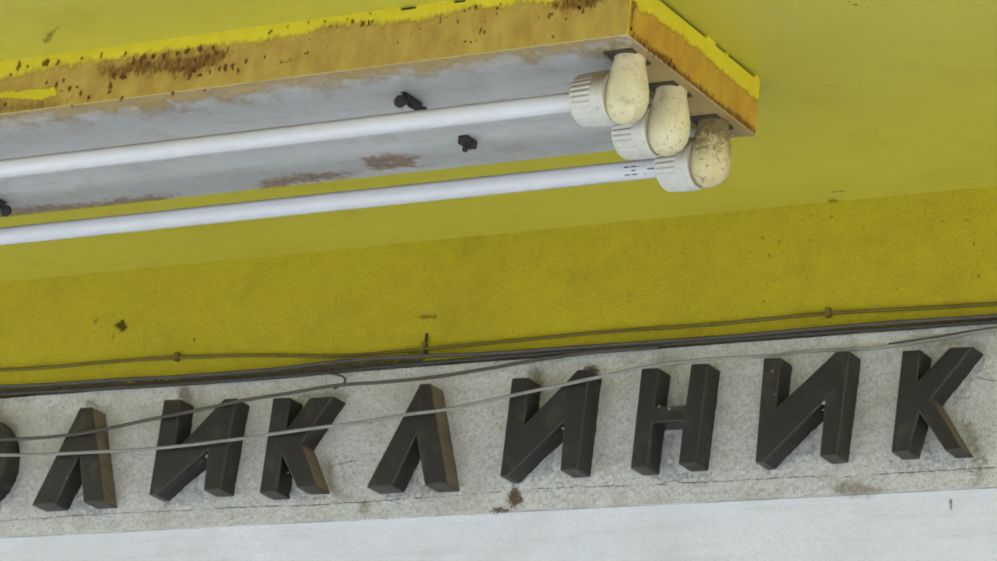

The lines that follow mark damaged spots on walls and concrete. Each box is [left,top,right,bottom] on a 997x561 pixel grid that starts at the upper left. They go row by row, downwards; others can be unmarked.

corrosion [491,488,523,514]